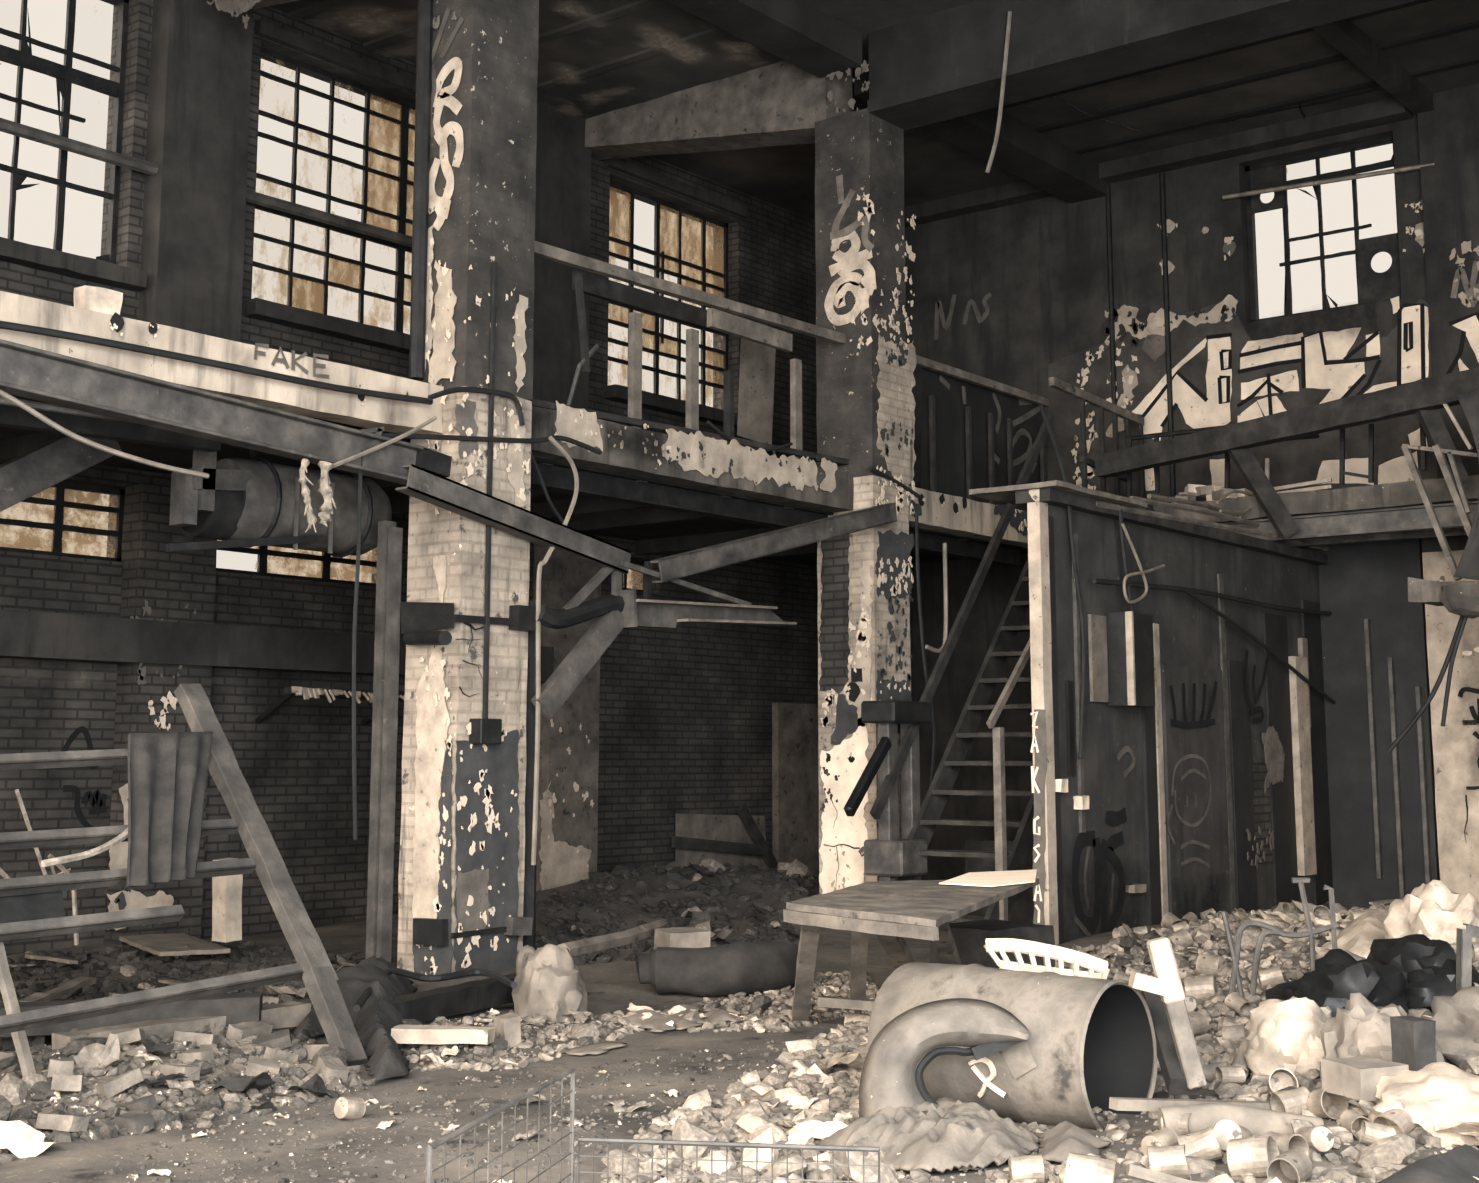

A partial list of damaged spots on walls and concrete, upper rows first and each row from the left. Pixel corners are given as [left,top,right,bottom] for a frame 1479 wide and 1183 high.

peeling [206,0,263,29]
peeling [826,60,870,113]
peeling [856,194,875,236]
peeling [1449,241,1479,307]
peeling [425,225,530,507]
peeling [1071,294,1239,490]
peeling [554,400,838,493]
peeling [433,555,447,603]
peeling [818,211,969,894]
peeling [994,504,1028,536]
peeling [412,629,520,979]
peeling [539,773,594,890]